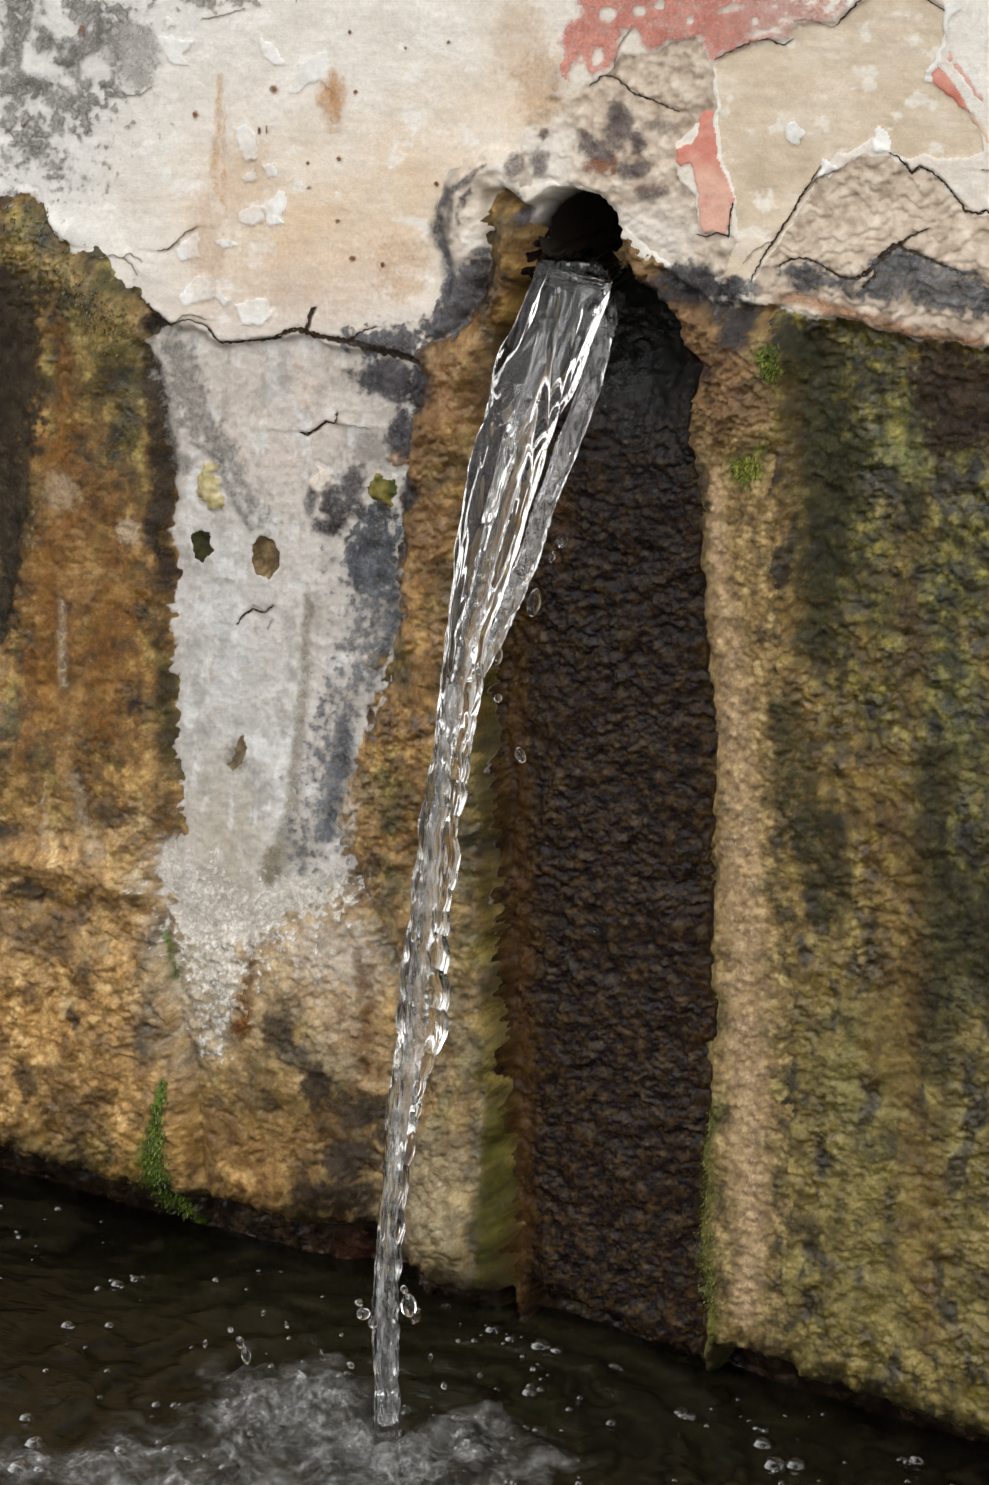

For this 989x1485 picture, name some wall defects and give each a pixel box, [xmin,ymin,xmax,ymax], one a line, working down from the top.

mould [0,0,159,207]
crack [100,226,419,364]
peeling [236,123,287,227]
water stain [648,259,761,353]
flaking render [518,0,989,349]
crack [743,166,966,289]
crack [889,152,989,215]
water stain [0,249,61,652]
water stain [905,345,989,467]
flaking render [147,231,415,942]
water stain [117,165,492,1065]
water stain [0,1061,388,1226]